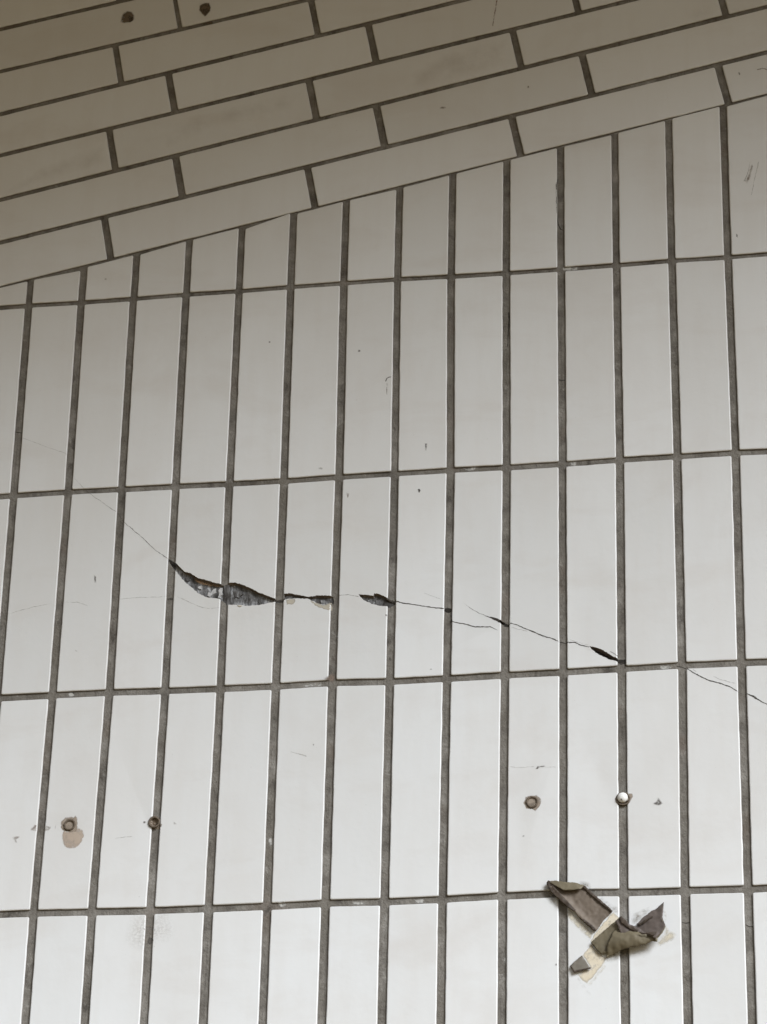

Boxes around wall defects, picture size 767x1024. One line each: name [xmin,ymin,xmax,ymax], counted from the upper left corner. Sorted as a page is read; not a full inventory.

crack [87,491,178,567]
spalling [170,563,334,611]
spalling [361,596,396,608]
crack [387,598,589,647]
crack [677,666,766,704]